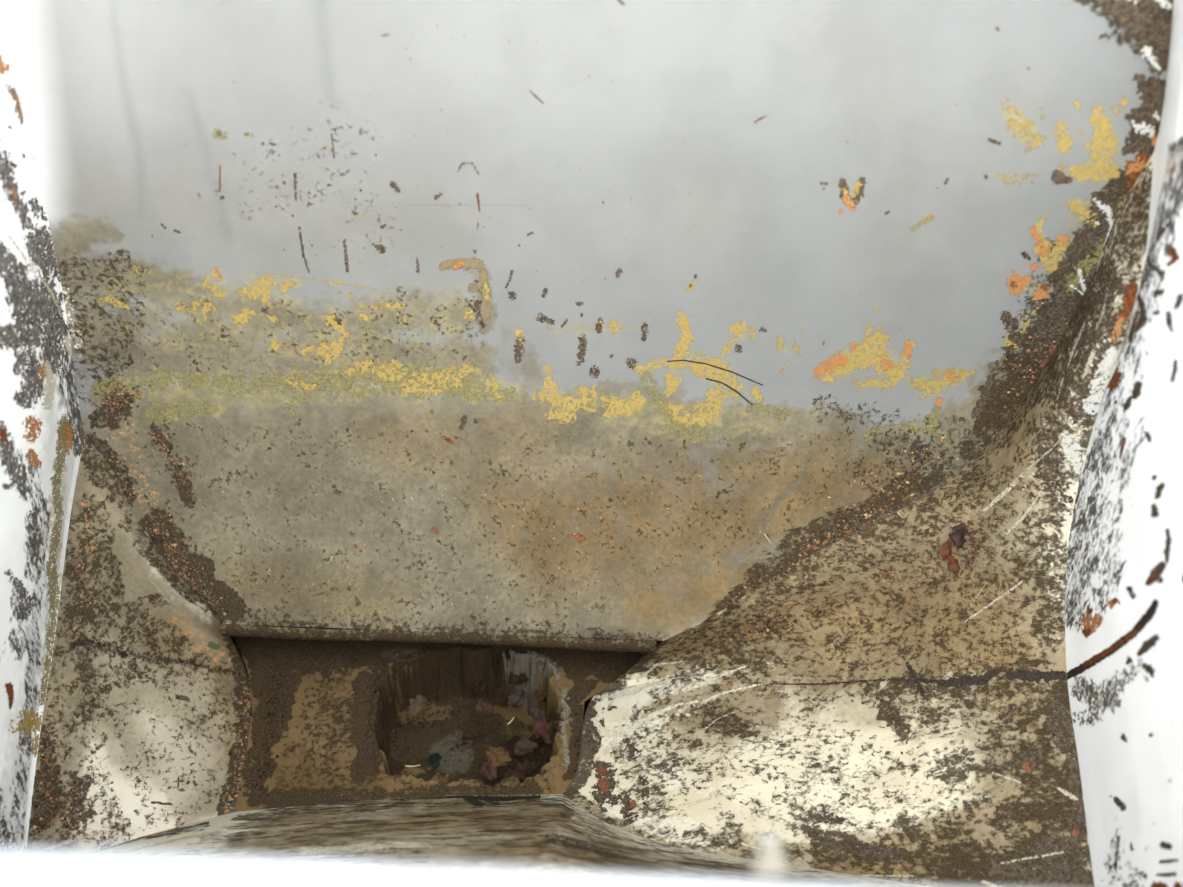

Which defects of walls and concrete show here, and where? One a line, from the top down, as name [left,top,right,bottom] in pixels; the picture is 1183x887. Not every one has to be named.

corrosion [0,53,10,75]
peeling [100,280,144,329]
peeling [175,215,406,328]
peeling [437,250,492,322]
peeling [536,302,583,329]
peeling [984,0,1173,507]
peeling [1165,293,1183,332]
peeling [91,309,804,445]
peeling [813,324,996,453]
crack [770,599,1159,697]